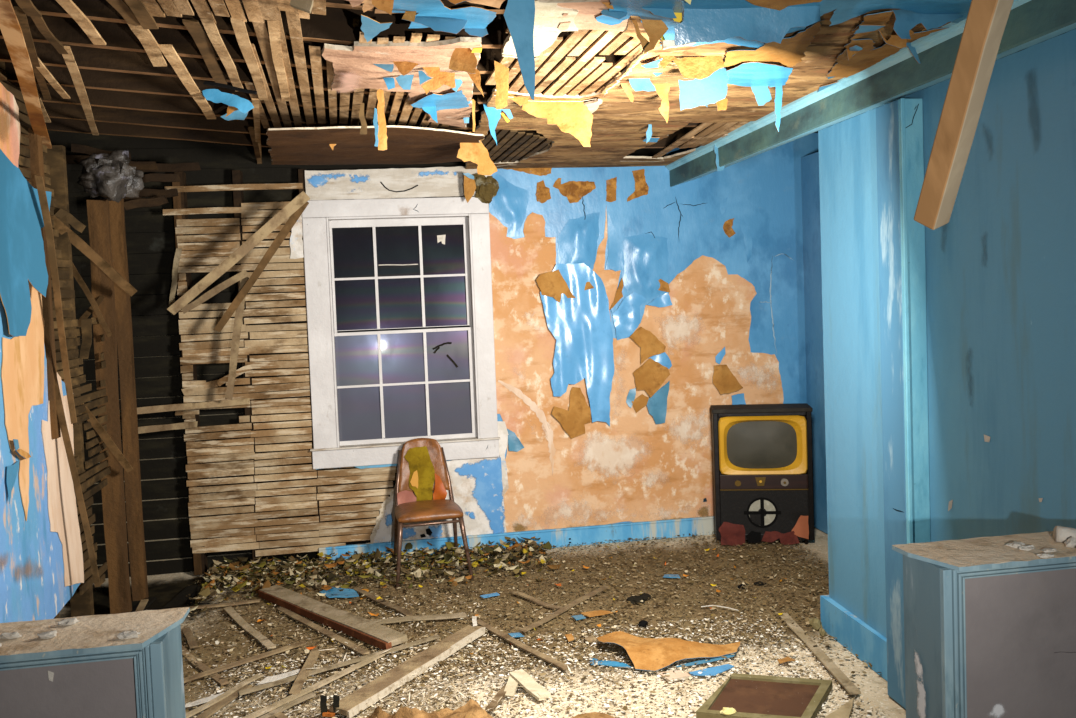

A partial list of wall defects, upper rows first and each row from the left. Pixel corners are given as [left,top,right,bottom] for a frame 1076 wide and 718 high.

spalling [13,0,106,135]
spalling [106,0,456,164]
spalling [485,0,648,113]
crack [645,197,706,238]
peeling [0,61,121,595]
peeling [137,121,784,556]